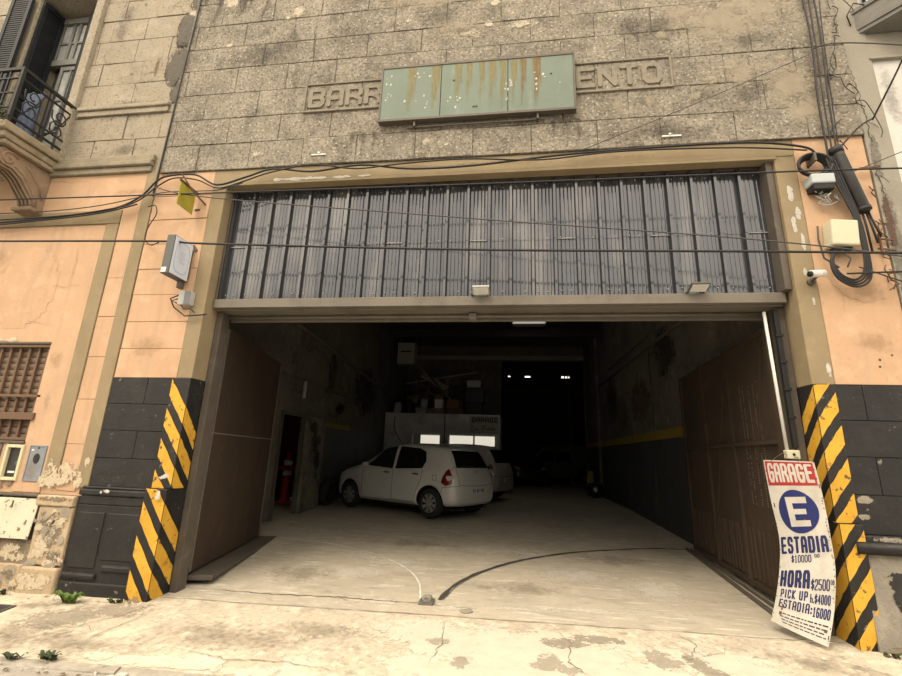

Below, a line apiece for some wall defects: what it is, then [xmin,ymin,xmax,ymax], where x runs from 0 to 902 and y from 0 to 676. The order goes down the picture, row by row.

flaking render [164,0,198,104]
flaking render [882,188,902,288]
peeling [0,457,90,590]
peeling [888,573,902,613]